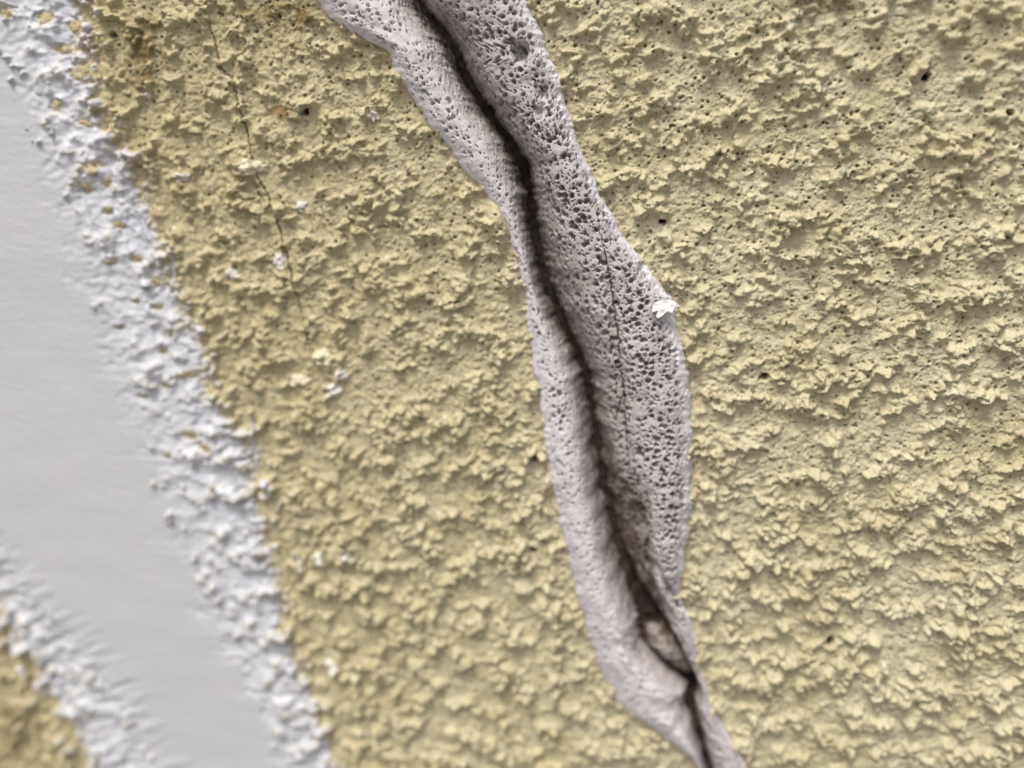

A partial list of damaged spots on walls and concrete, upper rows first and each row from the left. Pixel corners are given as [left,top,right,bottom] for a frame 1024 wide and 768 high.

crack [415,0,713,768]